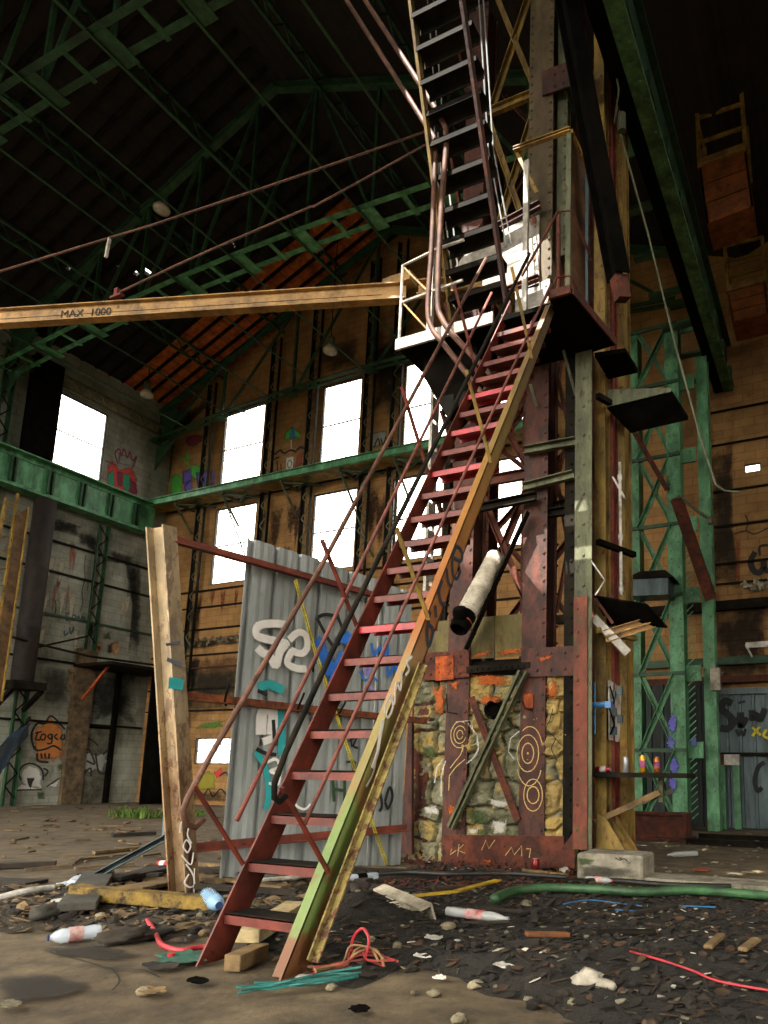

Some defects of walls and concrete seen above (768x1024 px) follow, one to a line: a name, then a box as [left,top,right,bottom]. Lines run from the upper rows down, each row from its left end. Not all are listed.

leakage [712,450,740,581]
leakage [55,520,96,551]
leakage [44,557,110,649]
leakage [111,552,140,647]
rust [474,648,521,657]
rust [432,681,459,714]
rust [475,675,508,705]